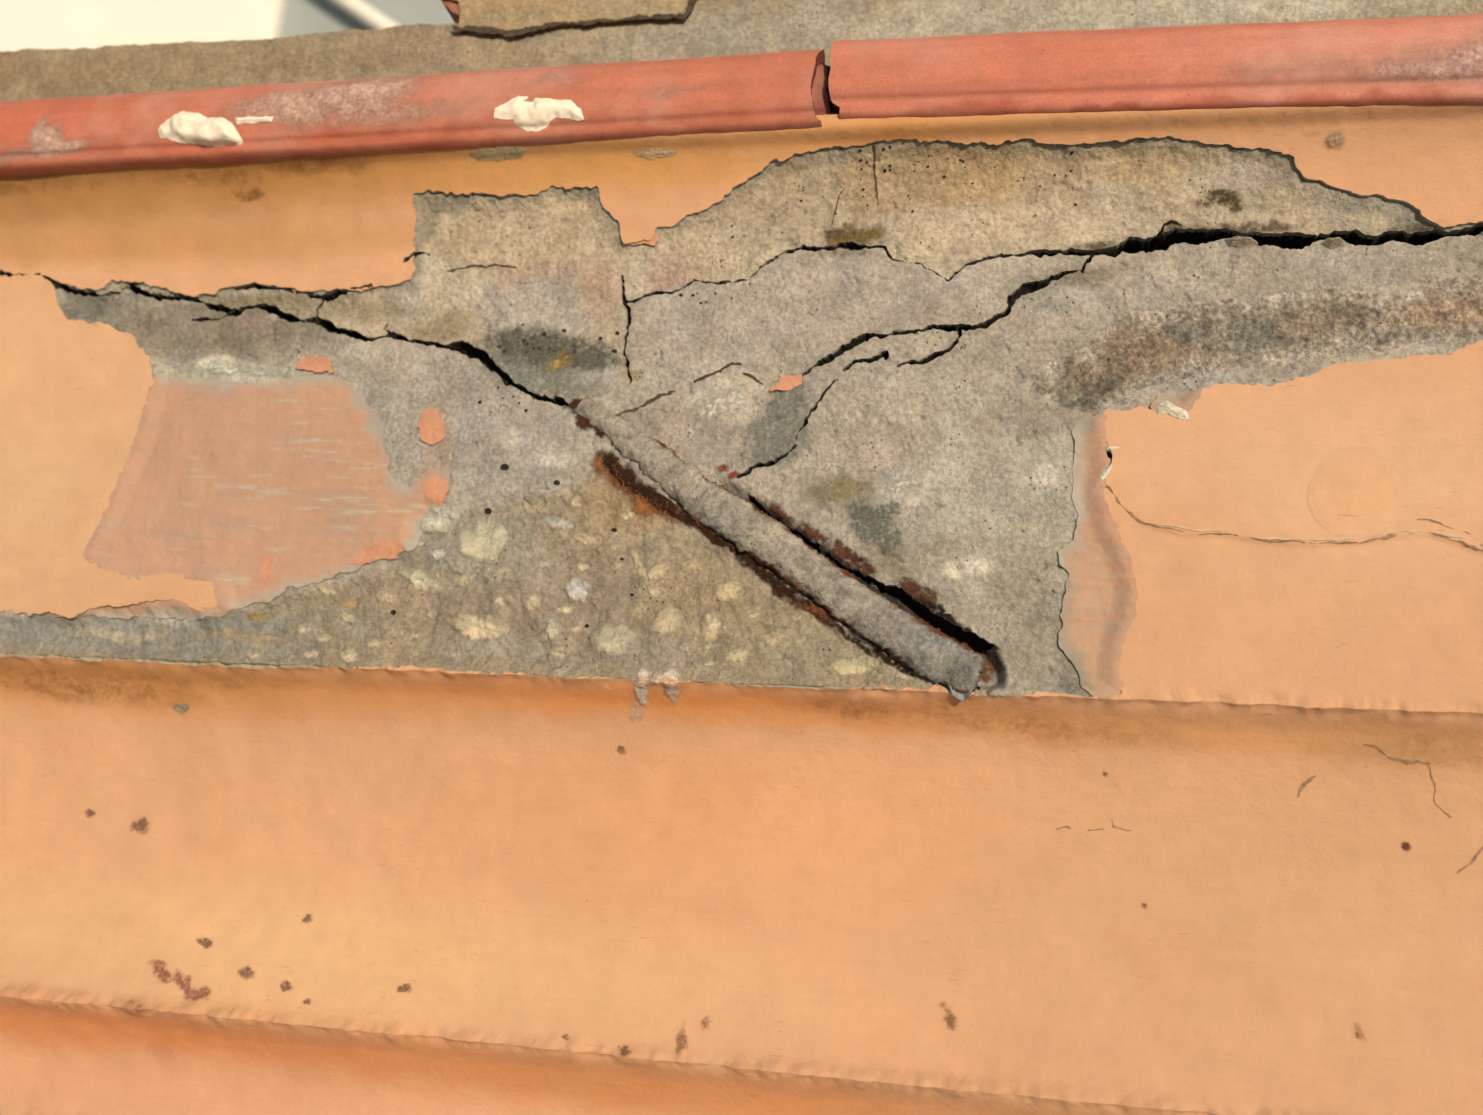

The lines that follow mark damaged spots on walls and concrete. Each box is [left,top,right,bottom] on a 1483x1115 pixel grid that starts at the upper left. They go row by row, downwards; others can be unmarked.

crack [404,252,517,272]
crack [0,270,569,407]
spalling [0,136,1483,702]
crack [615,145,1483,653]
rust [564,399,915,677]
rust [894,577,972,631]
rust [979,645,1002,682]
crack [1363,744,1452,818]